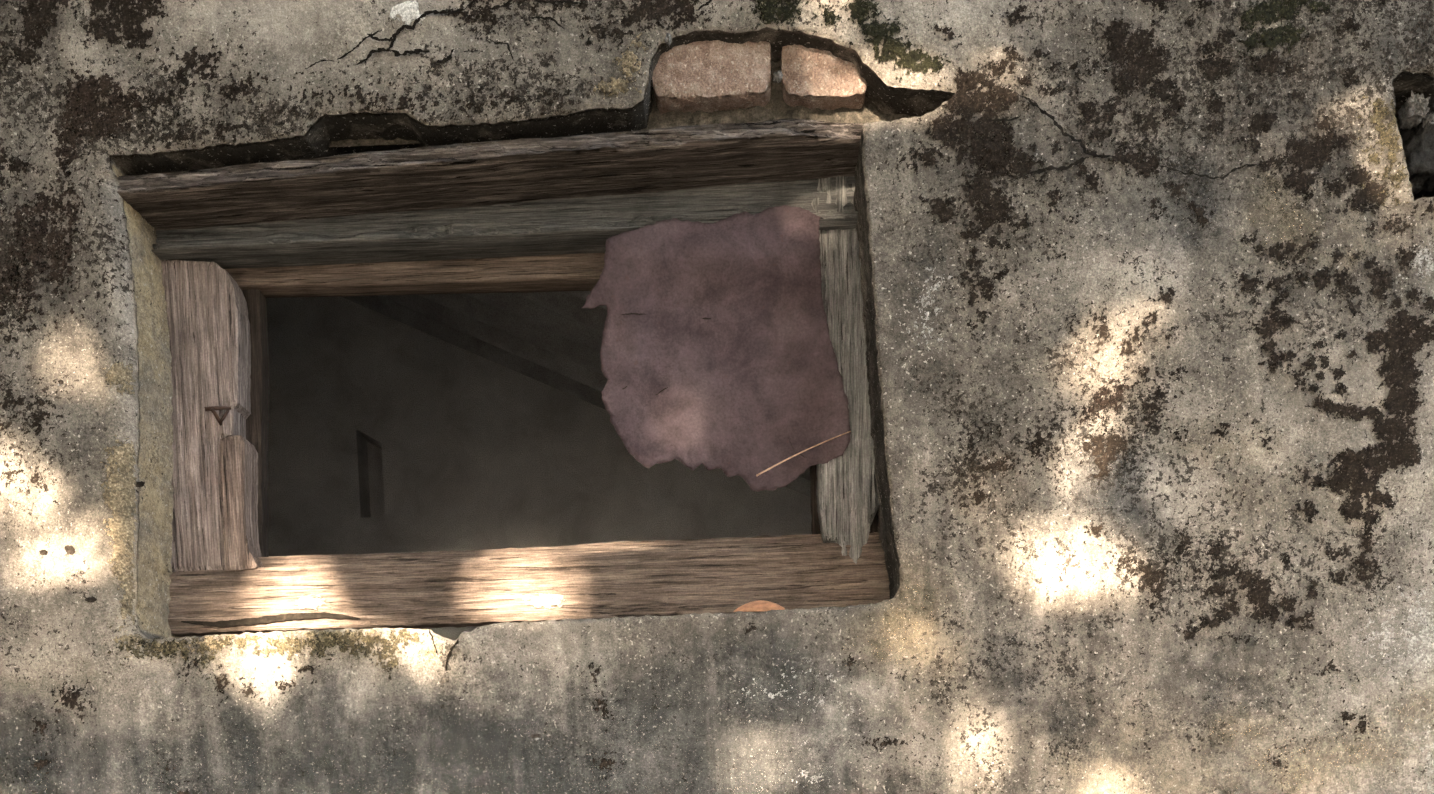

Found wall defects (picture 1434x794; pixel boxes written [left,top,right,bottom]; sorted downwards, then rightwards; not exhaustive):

crack [305,0,582,69]
spalling [586,32,915,130]
spalling [329,138,420,147]
crack [989,95,1116,174]
crack [1159,164,1264,179]